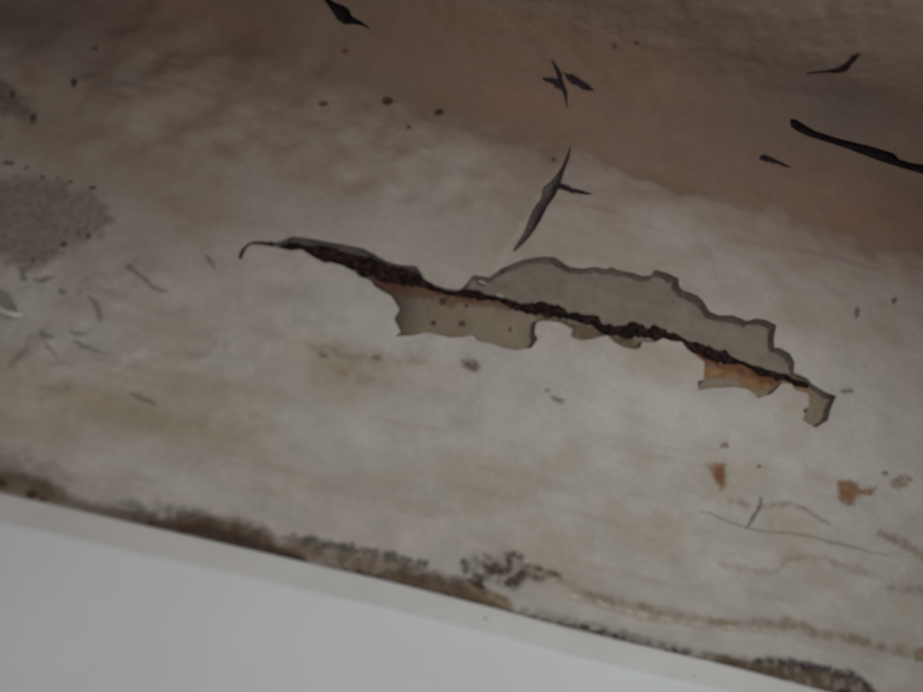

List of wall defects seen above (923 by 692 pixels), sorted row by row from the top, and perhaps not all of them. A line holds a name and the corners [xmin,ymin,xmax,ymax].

crack [324,0,370,29]
crack [542,60,594,107]
crack [807,53,868,74]
crack [759,155,791,168]
crack [790,119,923,174]
crack [513,145,592,252]
flaking render [239,236,836,428]
corrosion [711,465,725,485]
corrosion [839,481,872,505]
water stain [0,474,873,692]